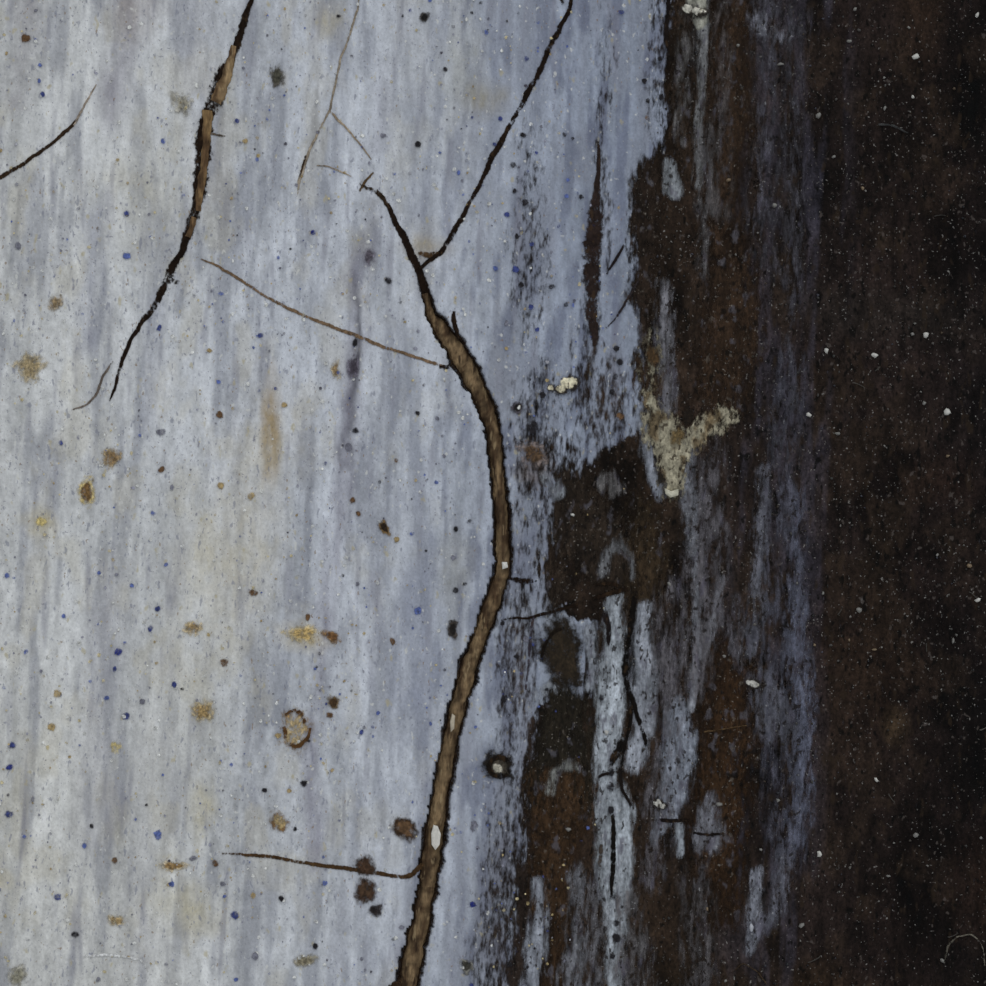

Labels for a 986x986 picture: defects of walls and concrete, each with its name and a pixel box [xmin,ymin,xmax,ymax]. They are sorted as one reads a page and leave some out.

crack [0,85,96,180]
peeling [663,158,682,200]
peeling [673,0,733,275]
peeling [751,0,809,204]
crack [73,0,647,986]
leakage [473,0,986,986]
peeling [531,281,814,986]
hole [482,750,515,781]
peeling [519,878,549,986]